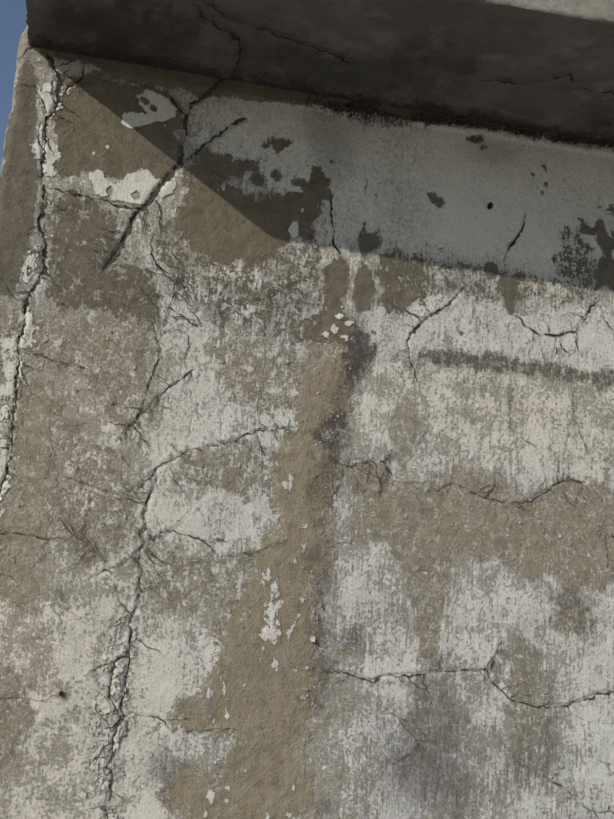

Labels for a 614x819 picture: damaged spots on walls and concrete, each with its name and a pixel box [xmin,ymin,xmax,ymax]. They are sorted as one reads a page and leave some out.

spalling [16,29,32,59]
crack [0,1,354,819]
peeling [0,48,460,819]
crack [383,287,465,382]
crack [309,379,614,523]
peeling [350,217,614,316]
peeling [414,348,614,393]
crack [508,299,614,380]
peeling [341,395,614,780]
crack [326,637,614,819]